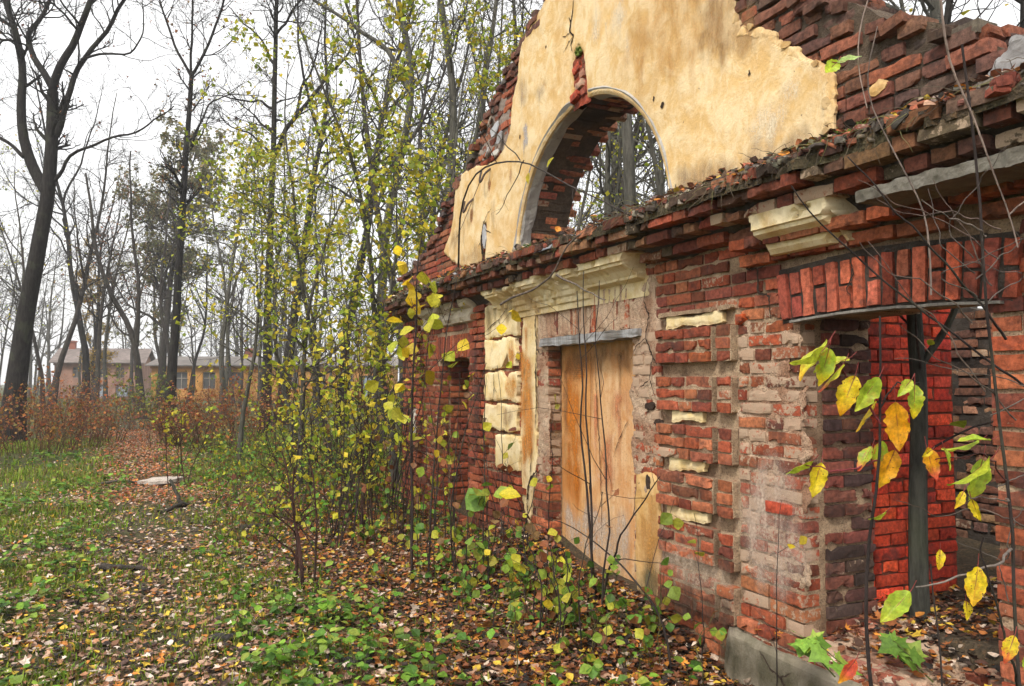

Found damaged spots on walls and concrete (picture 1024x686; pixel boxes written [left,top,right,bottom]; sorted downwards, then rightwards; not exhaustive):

peeling [732,13,838,134]
spalling [479,93,511,161]
spalling [735,314,748,325]
spalling [644,402,664,429]
spalling [765,500,795,515]